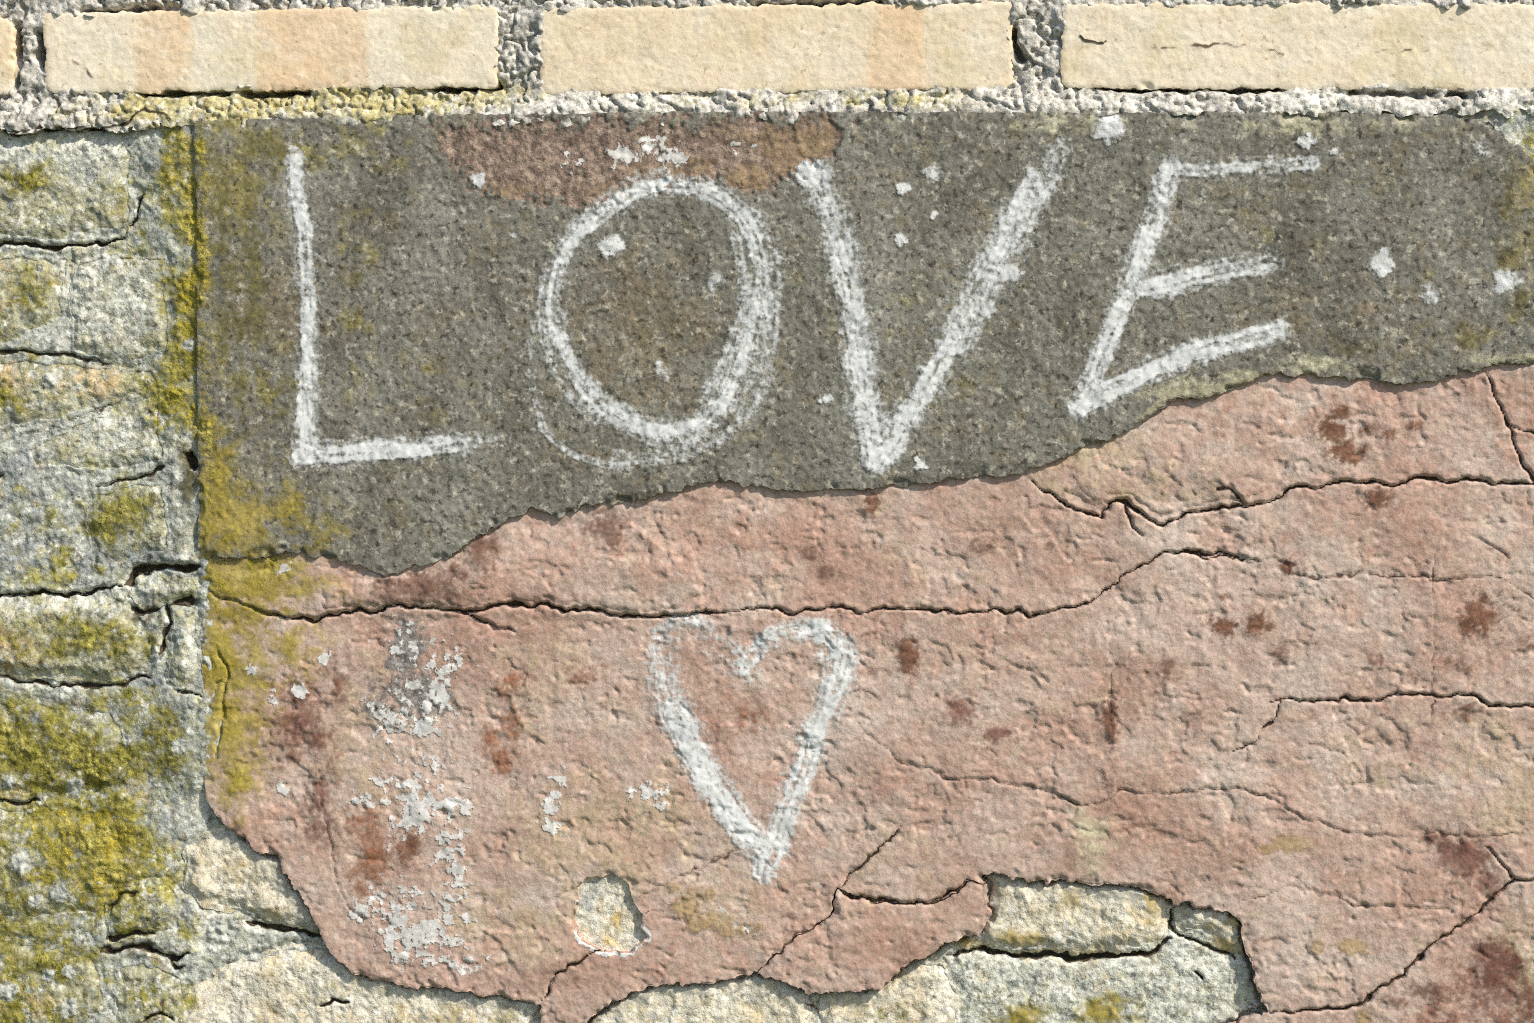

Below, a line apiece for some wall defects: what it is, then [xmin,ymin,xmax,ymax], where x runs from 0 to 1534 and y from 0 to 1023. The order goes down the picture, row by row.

spalling [429,110,858,216]
crack [0,374,1534,697]
crack [1232,642,1534,752]
crack [246,921,321,937]
damp [348,746,498,981]
spalling [574,872,652,958]
spalling [580,971,888,1023]
crack [841,825,970,905]
spalling [903,872,1163,974]
crack [945,907,1236,979]
spalling [1179,901,1261,1020]
crack [1269,832,1529,1014]